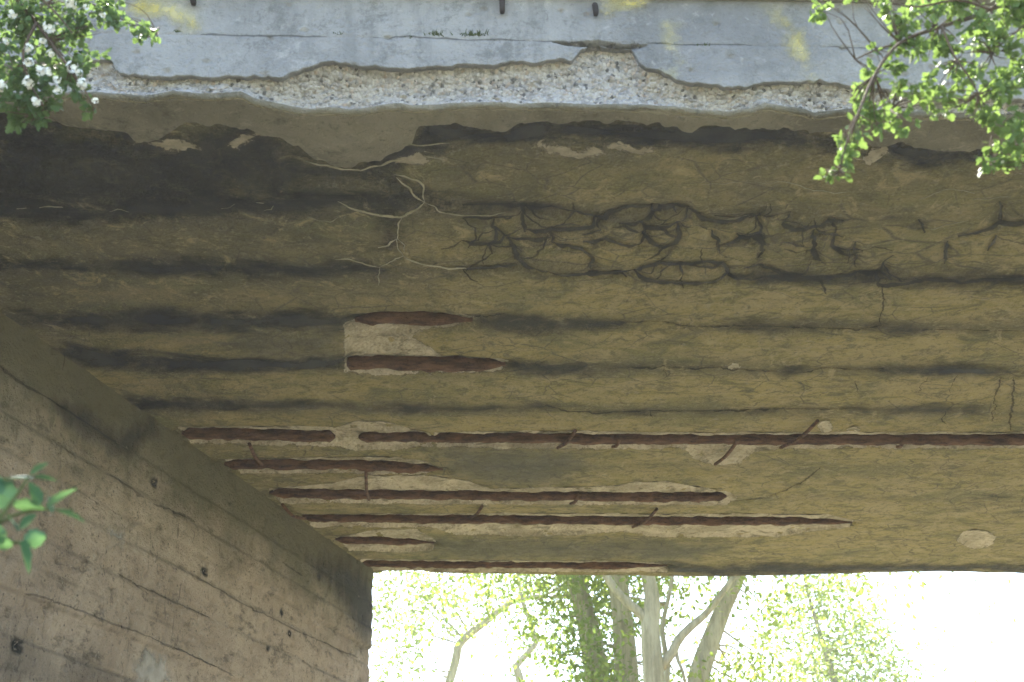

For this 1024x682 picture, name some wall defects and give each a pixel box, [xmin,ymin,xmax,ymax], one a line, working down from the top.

flaking render [0,50,1024,168]
damp [0,113,850,222]
damp [887,143,992,168]
crack [335,174,1024,331]
damp [18,309,356,333]
damp [62,343,344,373]
spalling [343,311,509,376]
corrosion [346,355,506,373]
corrosion [358,419,1024,466]
corrosion [182,427,852,528]
spalling [177,420,1024,573]
corrosion [335,536,434,546]